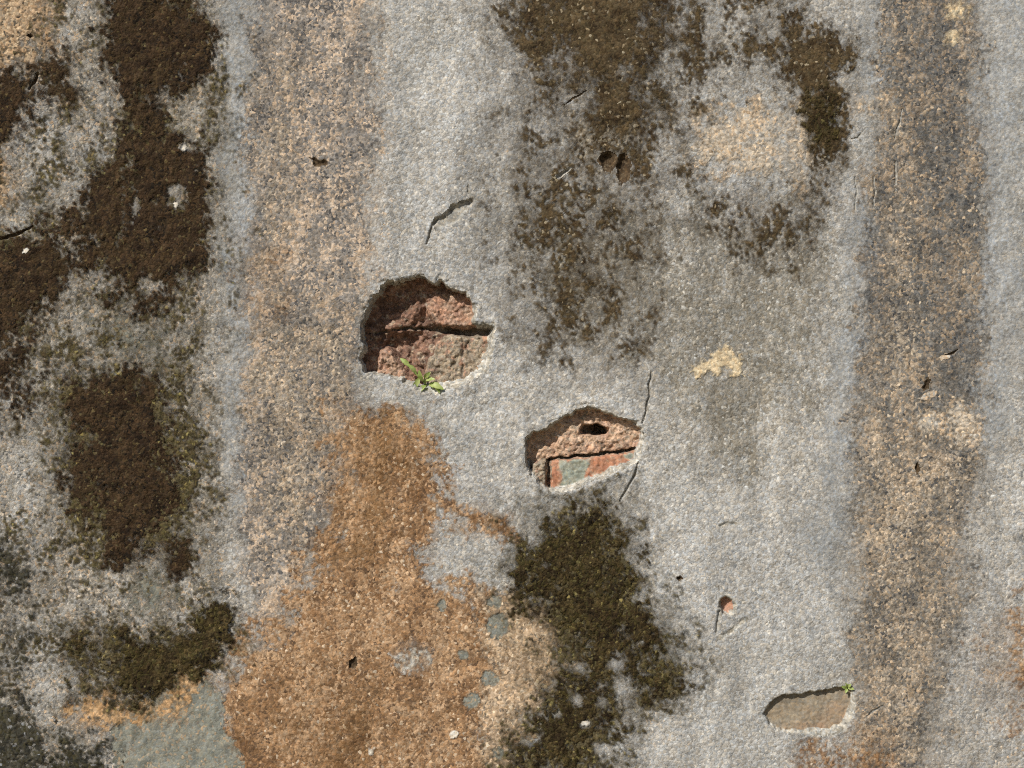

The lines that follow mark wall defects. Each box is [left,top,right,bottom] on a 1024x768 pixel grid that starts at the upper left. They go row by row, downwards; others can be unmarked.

spalling [359,274,506,405]
water stain [0,0,391,768]
crack [642,370,652,423]
water stain [485,0,1024,768]
spalling [525,405,644,493]
crack [620,461,639,501]
spalling [762,685,855,737]